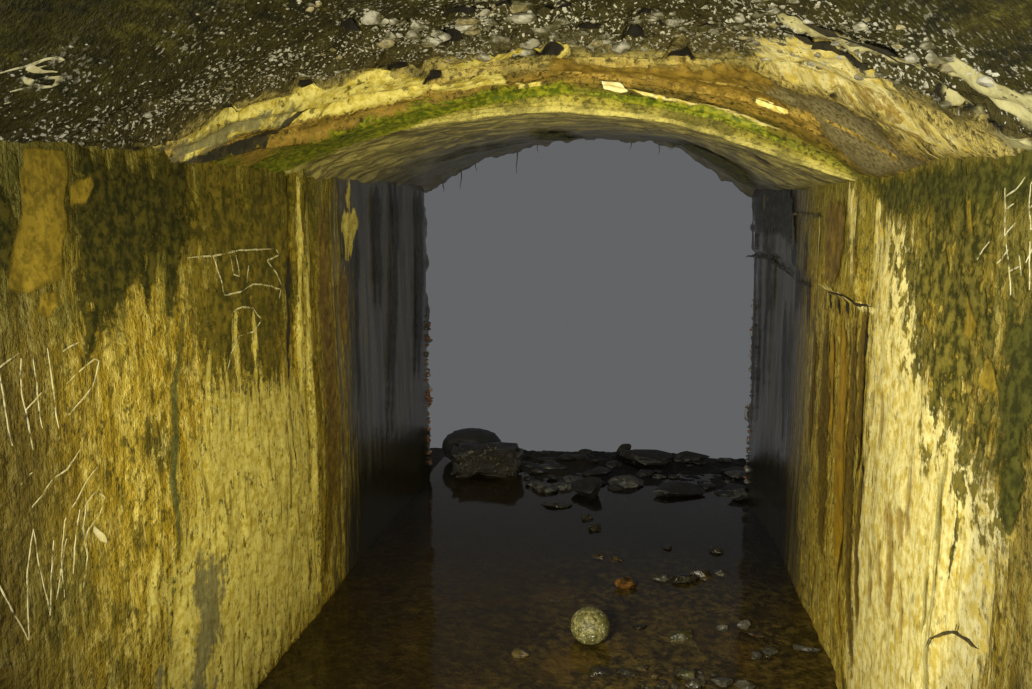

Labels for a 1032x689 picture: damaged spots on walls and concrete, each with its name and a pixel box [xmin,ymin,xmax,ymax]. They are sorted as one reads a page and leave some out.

peeling [4,0,1032,318]
damp [629,89,781,129]
damp [341,178,361,409]
damp [416,185,425,379]
crack [746,237,870,399]
crack [855,438,864,489]
damp [744,181,1016,689]
peeling [964,297,976,340]
peeling [978,359,998,394]
crack [925,624,977,649]